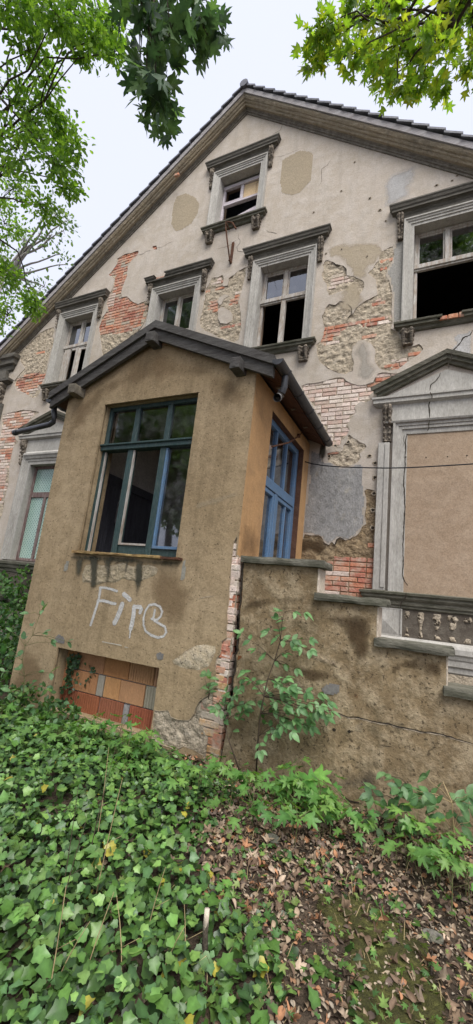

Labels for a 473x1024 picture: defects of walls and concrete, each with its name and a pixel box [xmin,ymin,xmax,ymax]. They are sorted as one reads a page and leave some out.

flaking render [99,251,149,355]
flaking render [200,268,246,342]
flaking render [0,328,54,519]
flaking render [301,247,423,597]
crack [400,330,473,608]
damp [76,556,172,589]
flaking render [152,534,243,762]
crack [324,710,473,747]